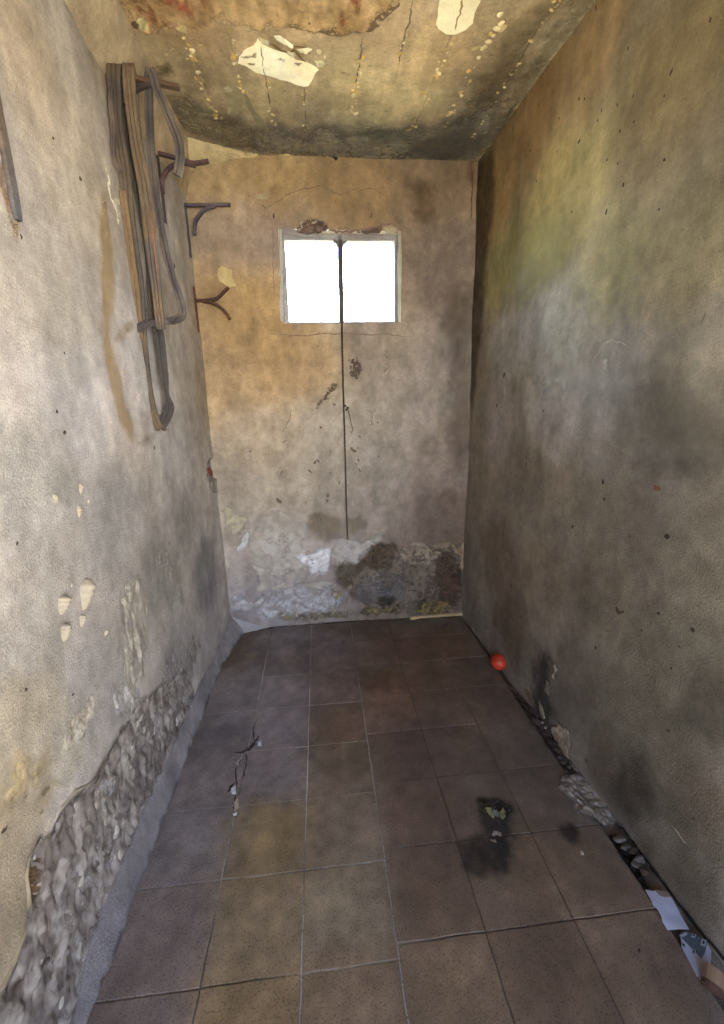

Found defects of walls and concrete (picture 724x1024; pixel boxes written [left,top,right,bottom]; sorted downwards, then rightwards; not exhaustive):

spalling [121,0,400,87]
crack [389,1,413,106]
crack [411,12,505,129]
damp [166,95,504,162]
damp [101,207,130,430]
crack [262,185,385,289]
flaking render [278,213,398,322]
flaking render [0,578,200,1024]
crack [227,720,259,819]
flaking render [551,723,587,775]